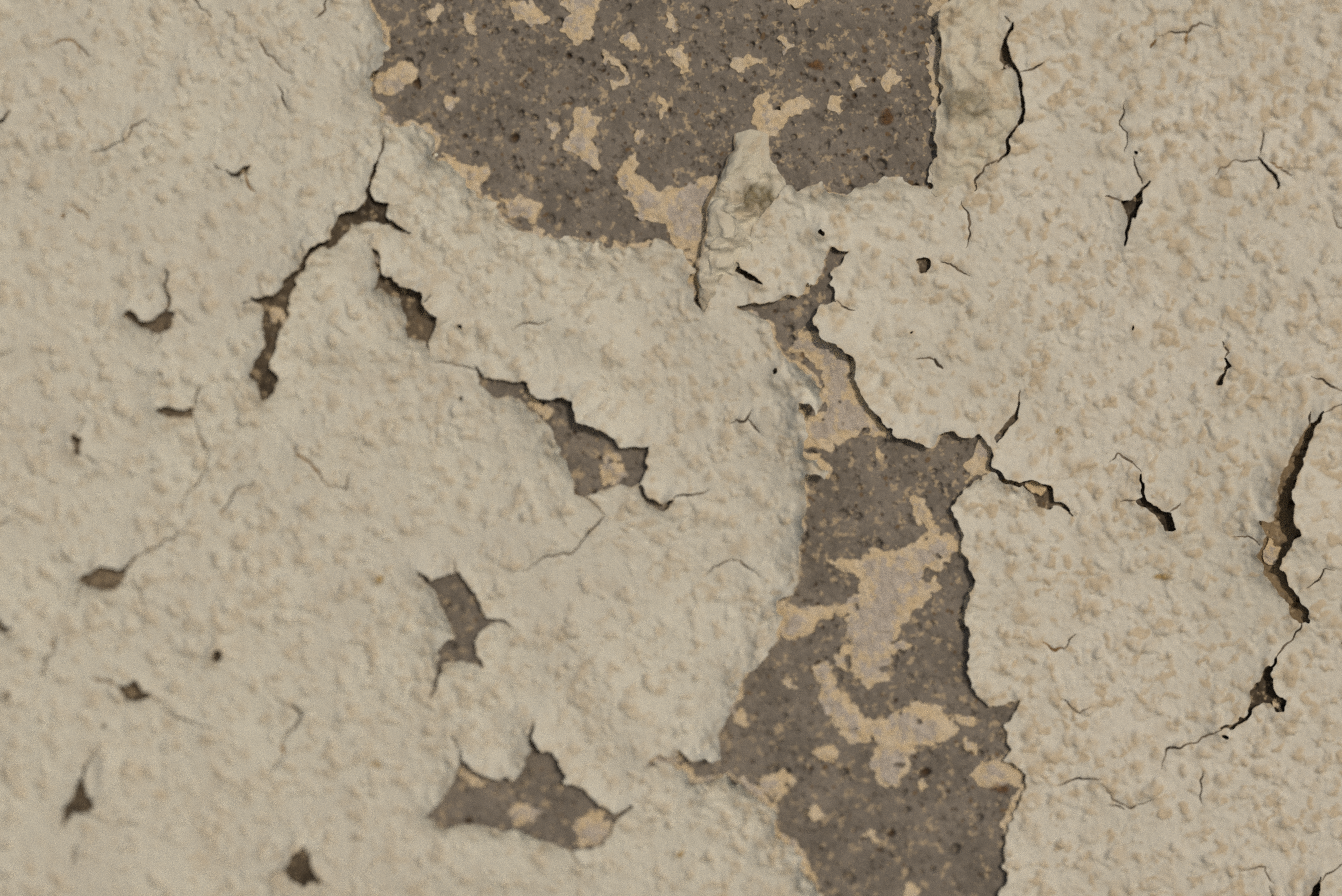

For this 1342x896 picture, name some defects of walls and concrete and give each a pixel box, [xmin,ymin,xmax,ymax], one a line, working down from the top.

peeling [370,0,1016,312]
crack [961,16,1044,248]
crack [1105,100,1151,246]
crack [123,269,193,346]
crack [997,391,1021,439]
crack [1216,341,1232,386]
peeling [646,229,1026,896]
crack [1001,478,1073,516]
crack [1058,376,1342,810]